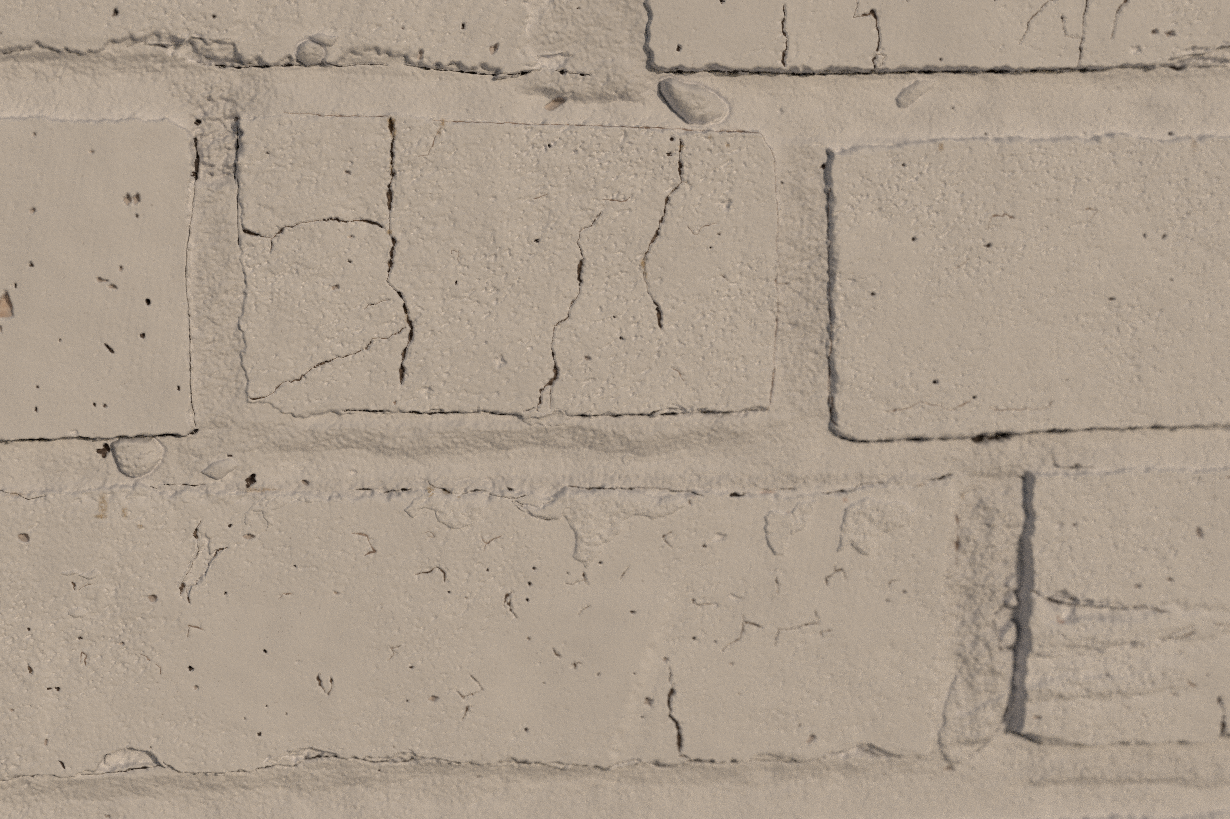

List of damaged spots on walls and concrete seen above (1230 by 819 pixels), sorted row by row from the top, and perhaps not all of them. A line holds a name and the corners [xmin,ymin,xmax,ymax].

crack [780,5,788,67]
crack [853,5,885,72]
crack [1019,0,1088,64]
crack [243,118,440,400]
crack [643,139,717,329]
crack [537,197,630,411]
crack [667,670,689,759]